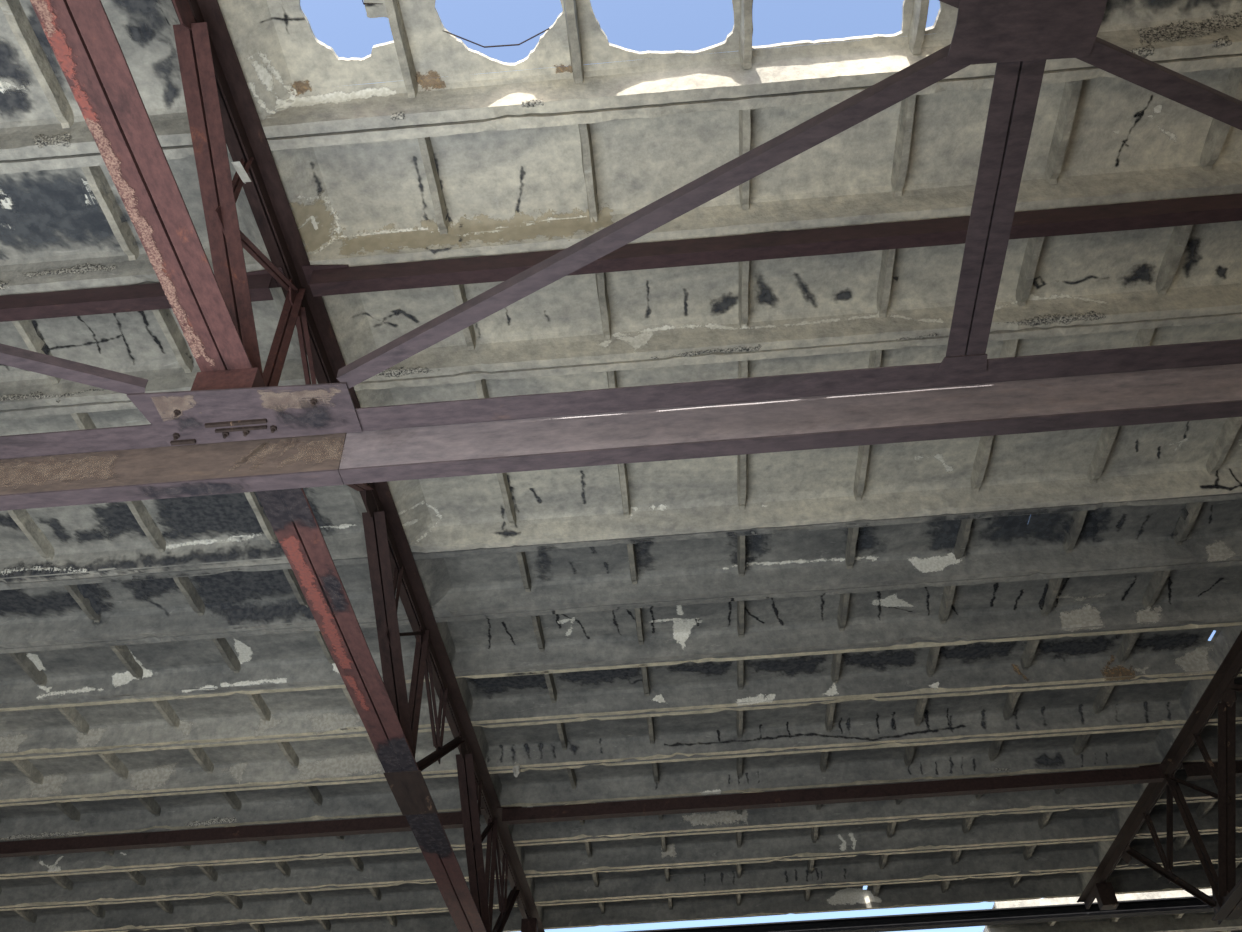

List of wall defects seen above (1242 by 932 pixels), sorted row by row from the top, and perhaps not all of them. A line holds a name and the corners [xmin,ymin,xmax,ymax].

water stain [1103,0,1219,20]
water stain [0,41,30,116]
water stain [28,8,61,85]
crack [1115,95,1153,167]
water stain [0,170,129,255]
water stain [597,279,944,352]
water stain [795,274,815,305]
water stain [994,276,1109,311]
water stain [0,492,314,699]
crack [486,618,514,649]
crack [552,606,655,639]
crack [664,709,965,746]